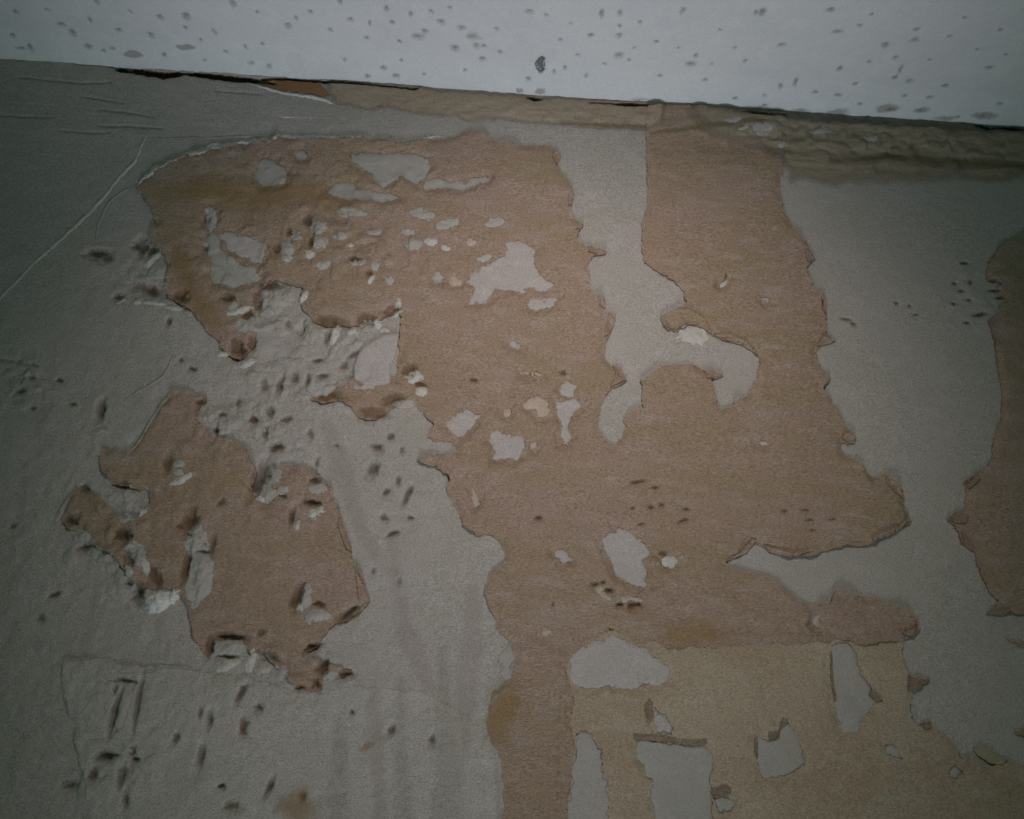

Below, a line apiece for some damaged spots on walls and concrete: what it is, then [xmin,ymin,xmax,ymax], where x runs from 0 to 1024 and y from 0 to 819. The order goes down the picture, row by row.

peeling [54,390,370,692]
peeling [132,80,1024,819]